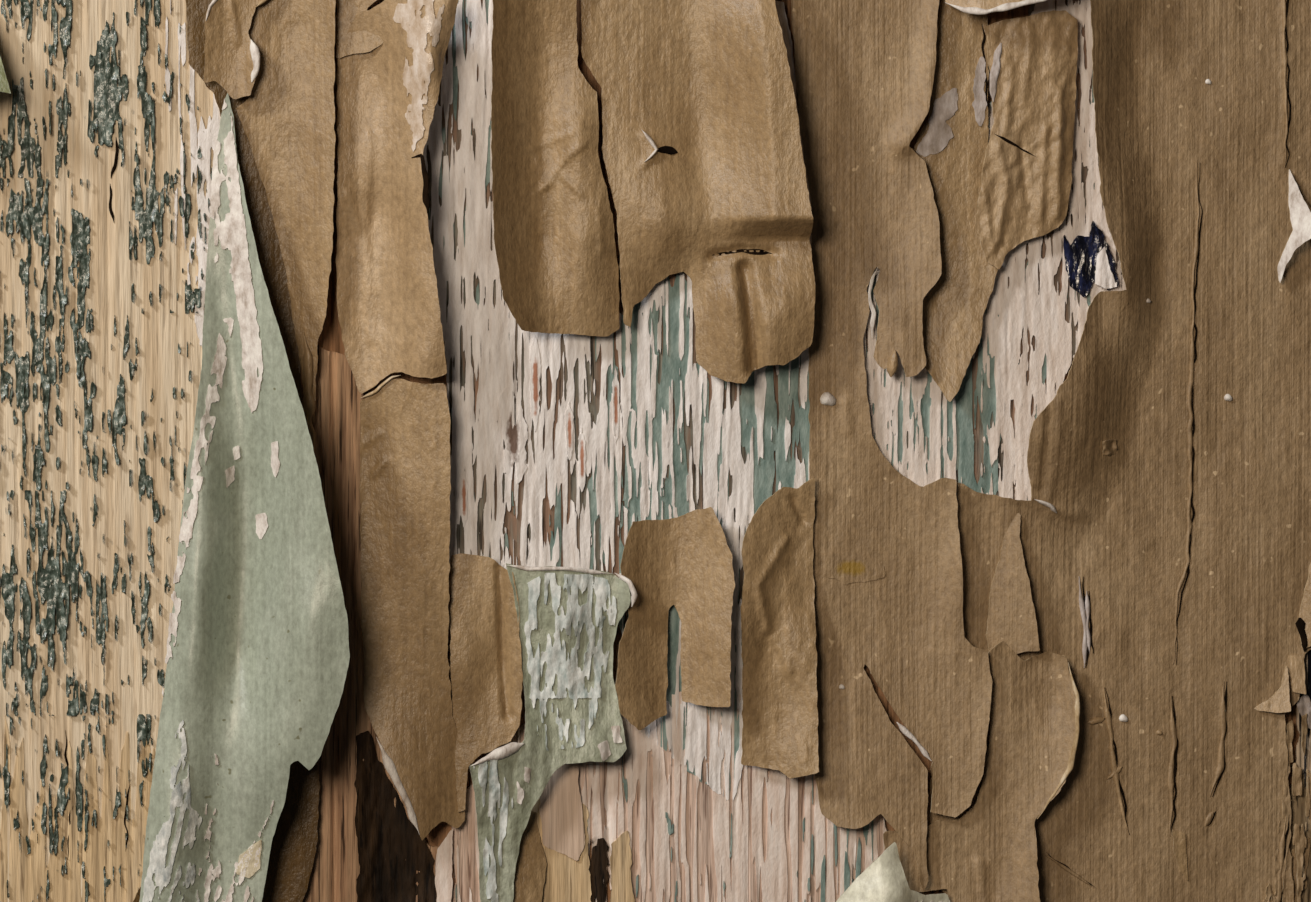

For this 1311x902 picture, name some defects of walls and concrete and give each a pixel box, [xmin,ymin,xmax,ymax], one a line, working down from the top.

peeling [0,0,263,902]
peeling [196,0,1080,902]
peeling [791,0,1311,902]
crack [1173,162,1203,663]
crack [1168,681,1227,835]